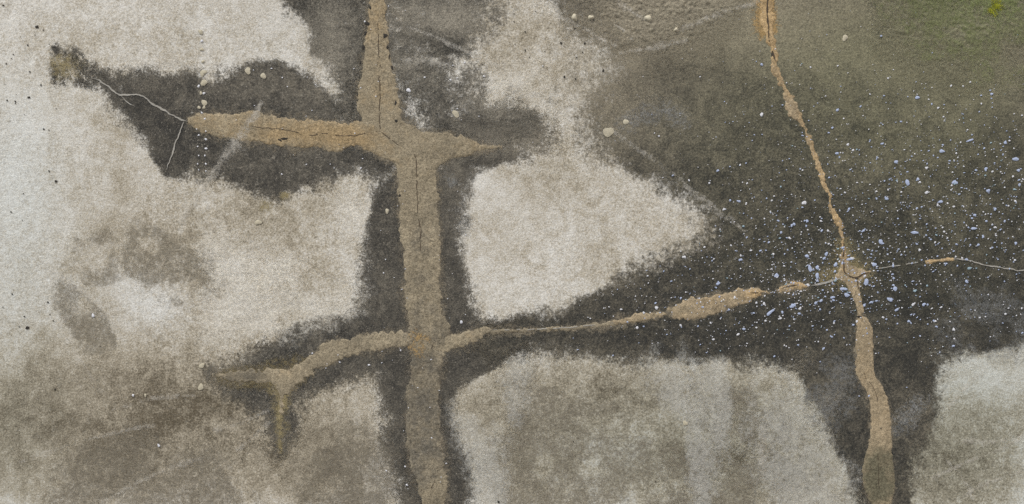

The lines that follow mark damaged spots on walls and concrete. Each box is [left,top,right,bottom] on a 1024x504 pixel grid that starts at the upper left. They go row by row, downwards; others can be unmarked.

damp [49,0,422,504]
crack [92,0,897,504]
damp [385,0,1024,504]
crack [879,258,1024,271]